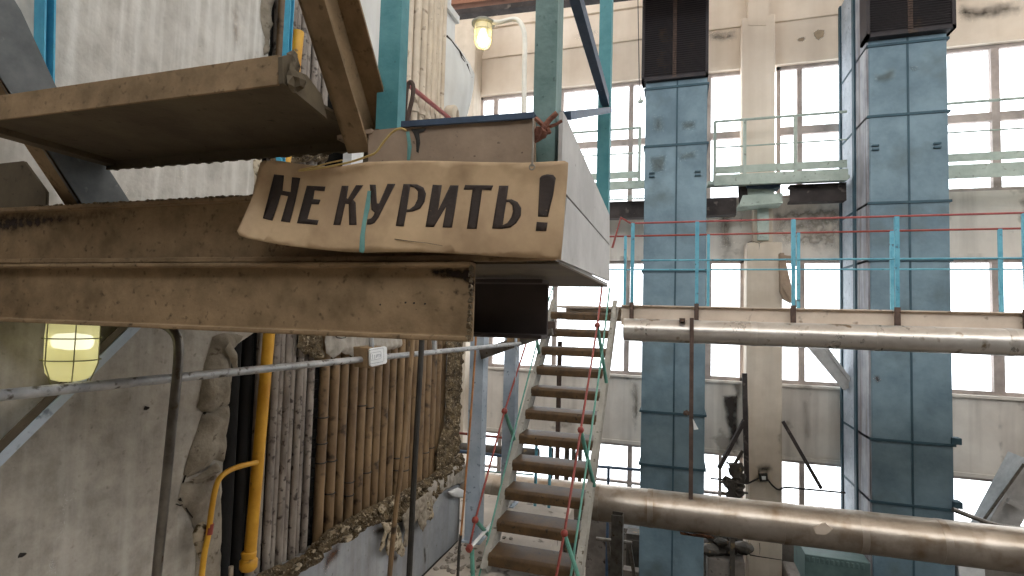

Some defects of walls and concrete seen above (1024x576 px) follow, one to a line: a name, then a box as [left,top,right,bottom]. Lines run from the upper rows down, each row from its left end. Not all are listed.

leakage [963,7,1009,16]
flaking render [325,336,403,358]
peeling [177,333,243,576]
flaking render [422,464,466,503]